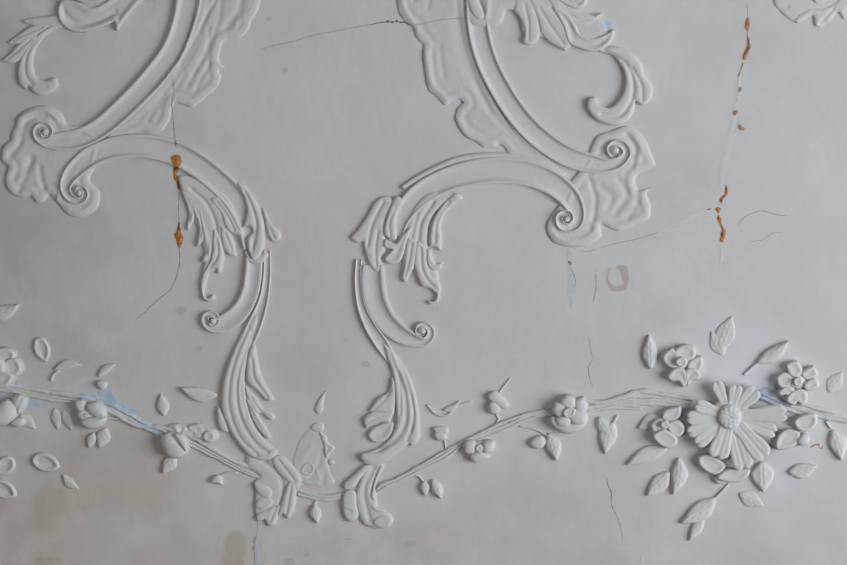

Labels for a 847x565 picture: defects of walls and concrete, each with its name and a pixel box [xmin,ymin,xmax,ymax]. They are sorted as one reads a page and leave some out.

crack [261,17,463,50]
rust [738,17,752,93]
rust [170,153,182,191]
rust [174,221,184,248]
rust [706,184,729,243]
crack [135,248,181,321]
damp [606,264,630,292]
crack [251,482,260,565]